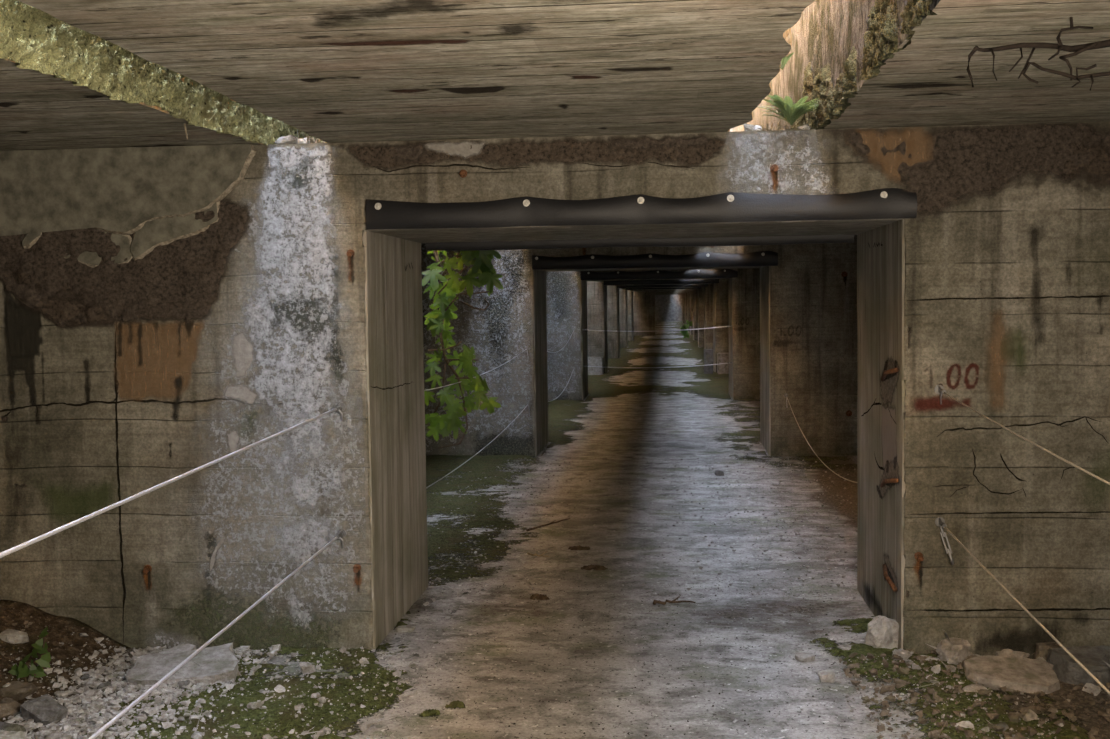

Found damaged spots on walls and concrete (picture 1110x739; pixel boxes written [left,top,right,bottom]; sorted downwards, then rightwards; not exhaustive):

flaking render [0,144,257,328]
leakage [4,286,44,424]
leakage [47,483,110,523]
crack [0,322,299,643]
leakage [116,145,366,650]
crack [908,416,1110,515]